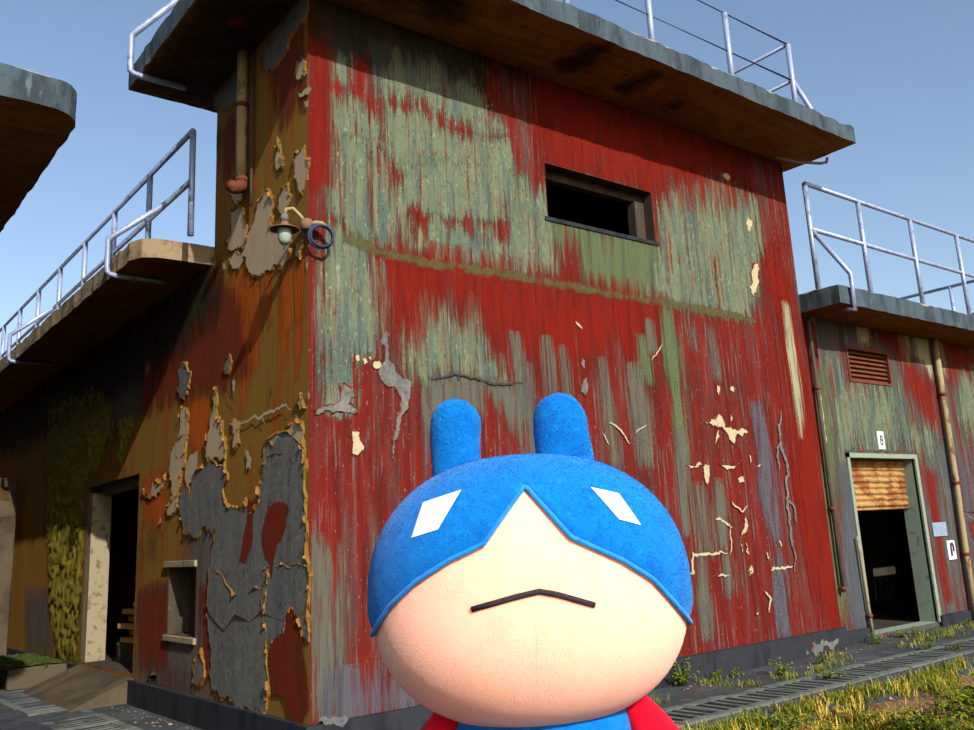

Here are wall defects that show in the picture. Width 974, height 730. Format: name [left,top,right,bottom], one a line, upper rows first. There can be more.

leakage [138,0,289,111]
peeling [260,0,312,108]
leakage [308,0,749,209]
corrosion [138,250,306,454]
peeling [142,37,765,714]